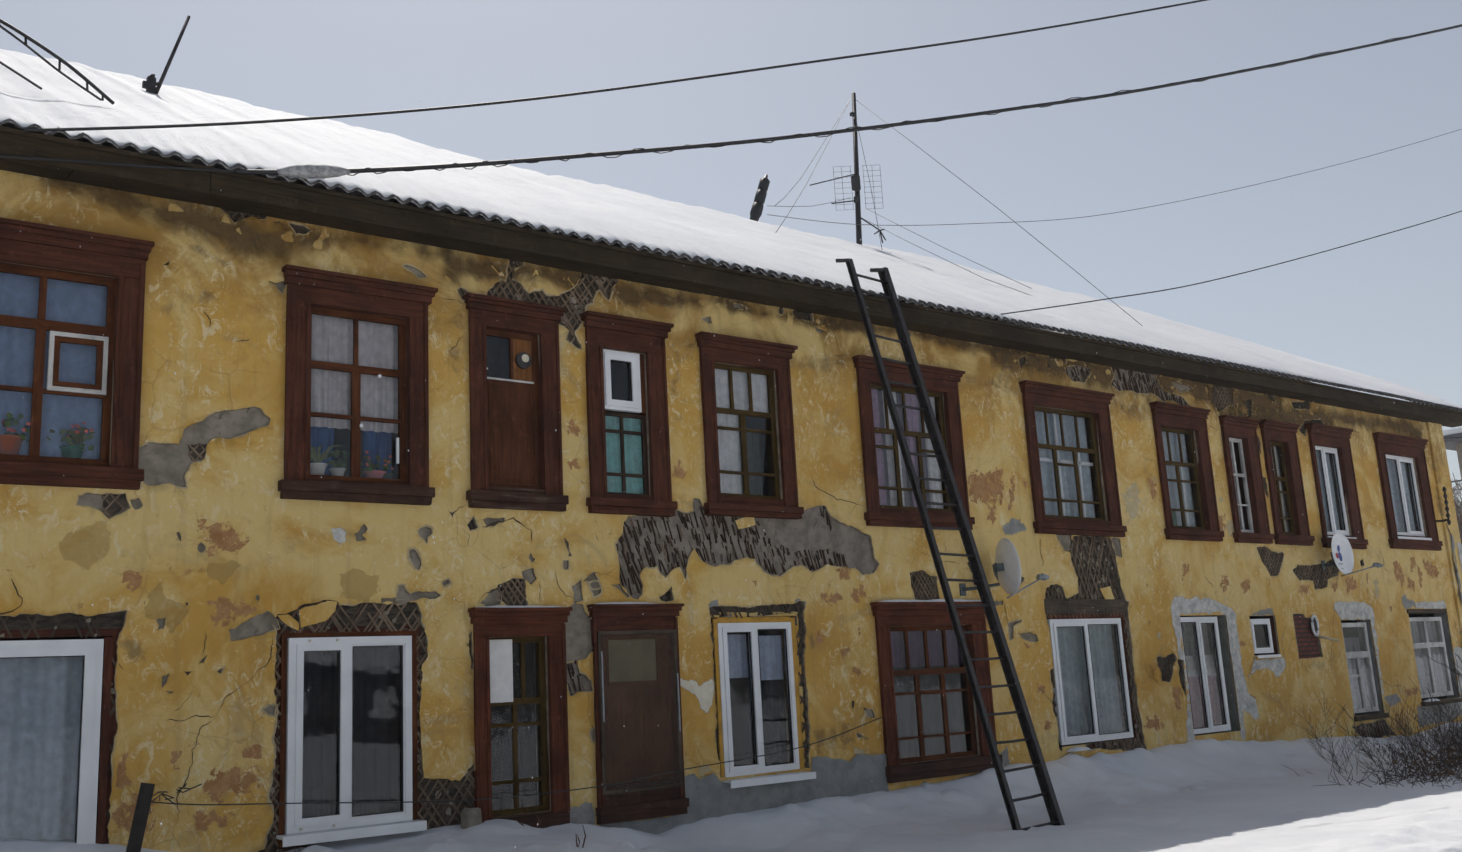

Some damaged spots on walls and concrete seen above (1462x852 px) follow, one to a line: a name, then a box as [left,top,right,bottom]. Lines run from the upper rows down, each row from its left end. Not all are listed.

flaking render [457,261,619,350]
flaking render [76,407,270,519]
crack [169,638,273,816]
flaking render [193,524,475,852]
flaking render [480,555,535,606]
flaking render [562,498,880,696]
flaking render [680,601,811,778]
flaking render [1008,478,1185,752]
flaking render [1219,496,1439,659]